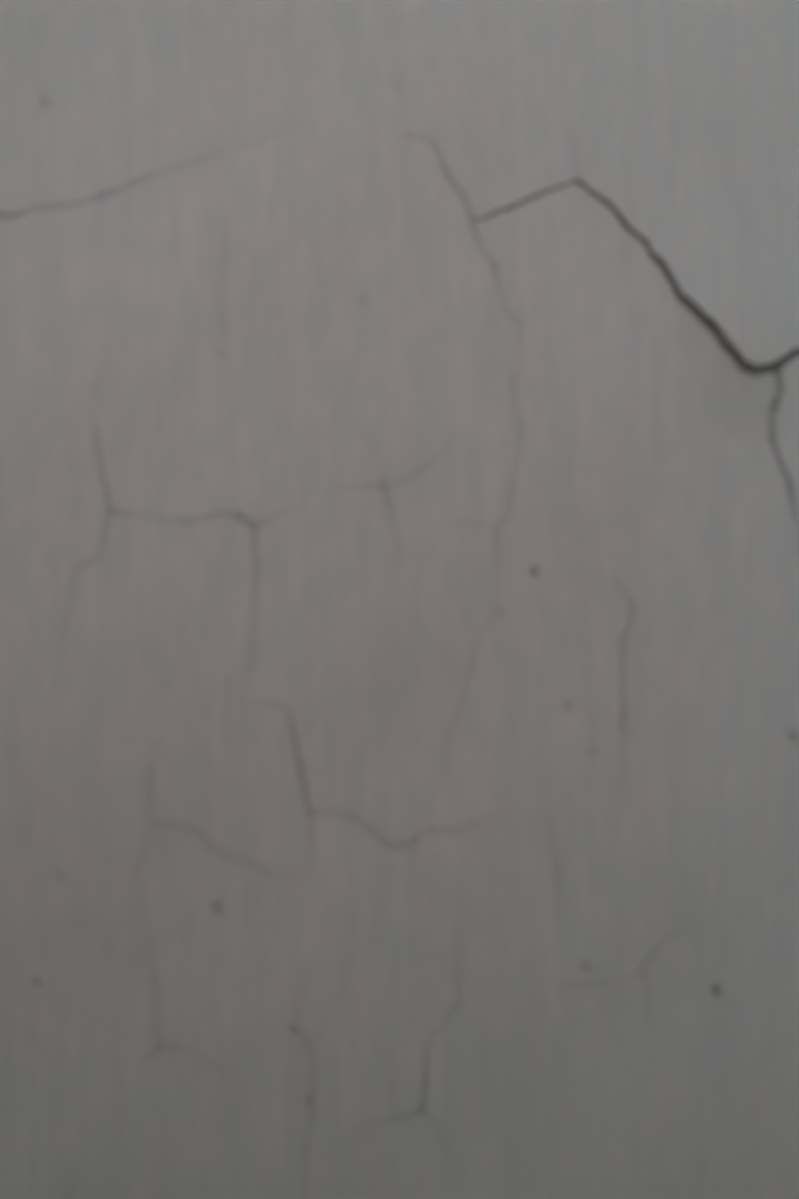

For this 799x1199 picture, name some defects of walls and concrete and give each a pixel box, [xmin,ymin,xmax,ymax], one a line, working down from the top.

crack [481,179,799,402]